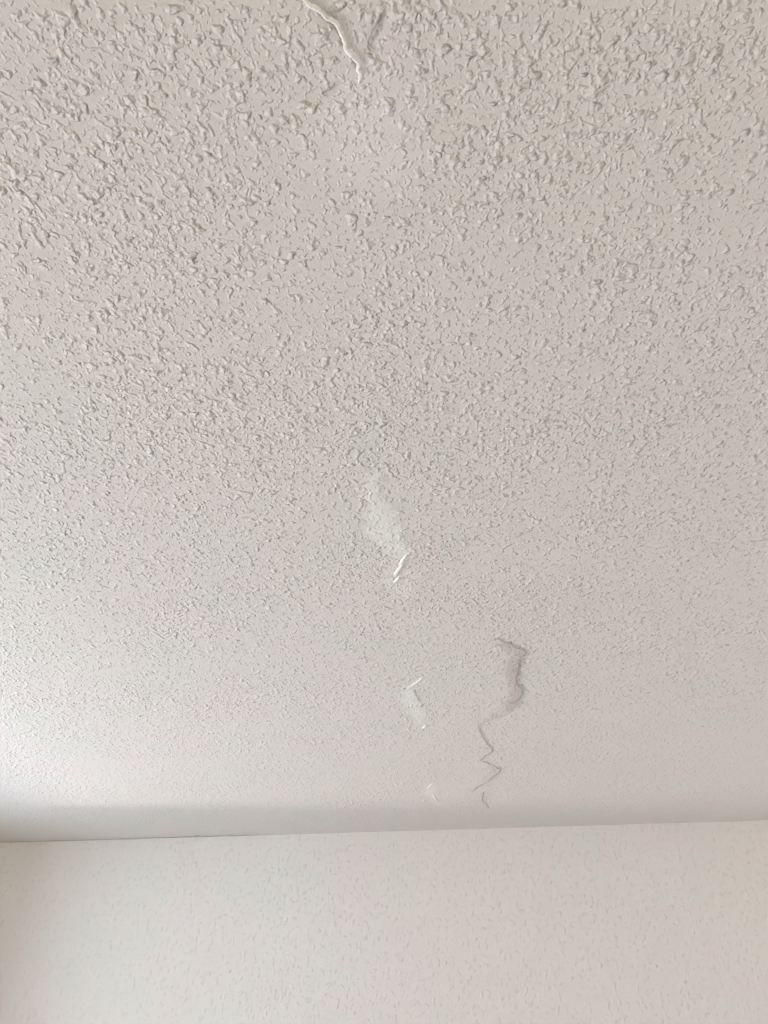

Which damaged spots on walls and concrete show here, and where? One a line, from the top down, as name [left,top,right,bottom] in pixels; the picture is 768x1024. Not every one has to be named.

crack [303,0,382,96]
crack [472,638,535,809]